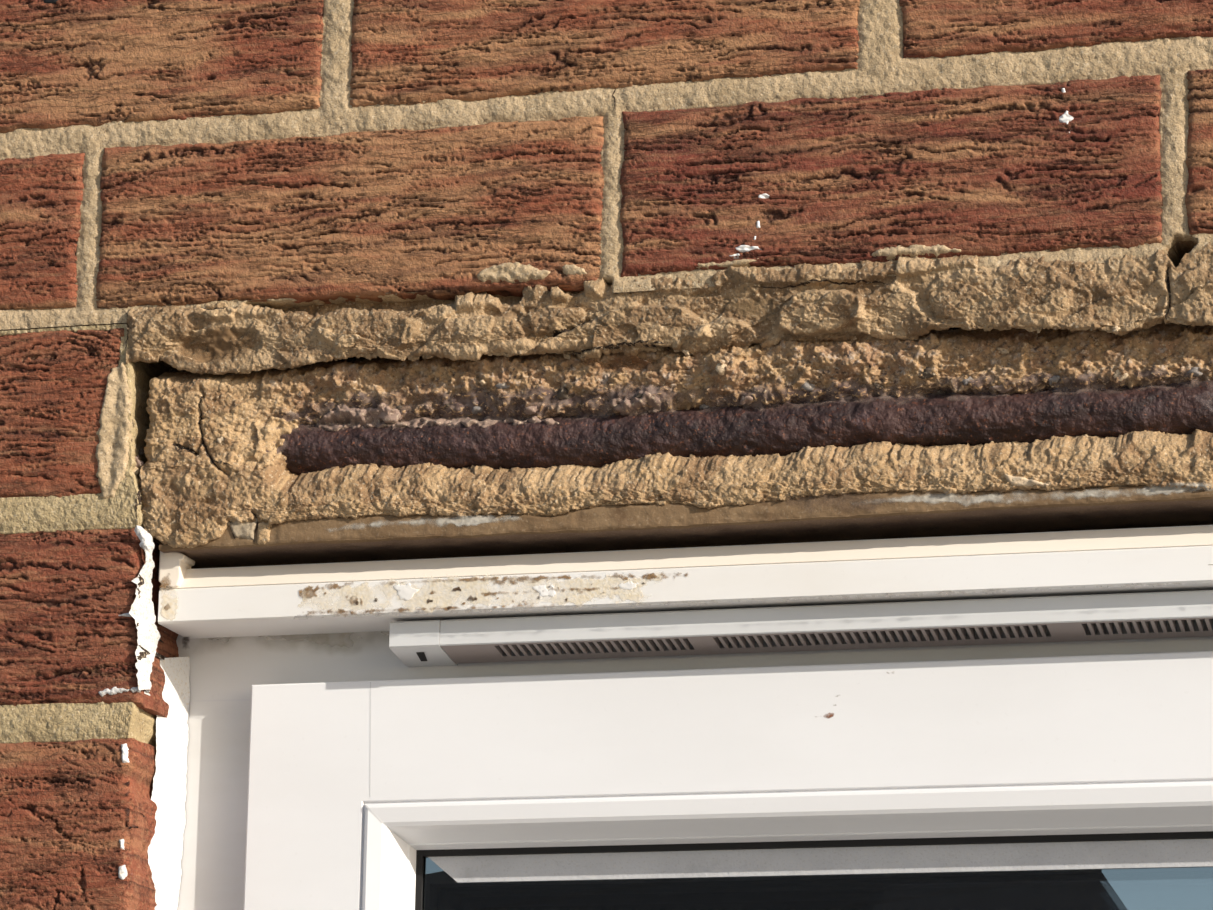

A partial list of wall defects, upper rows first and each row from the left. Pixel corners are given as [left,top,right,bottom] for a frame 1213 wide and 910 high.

crack [1164,267,1172,318]
crack [173,389,231,473]
spalling [139,321,1213,548]